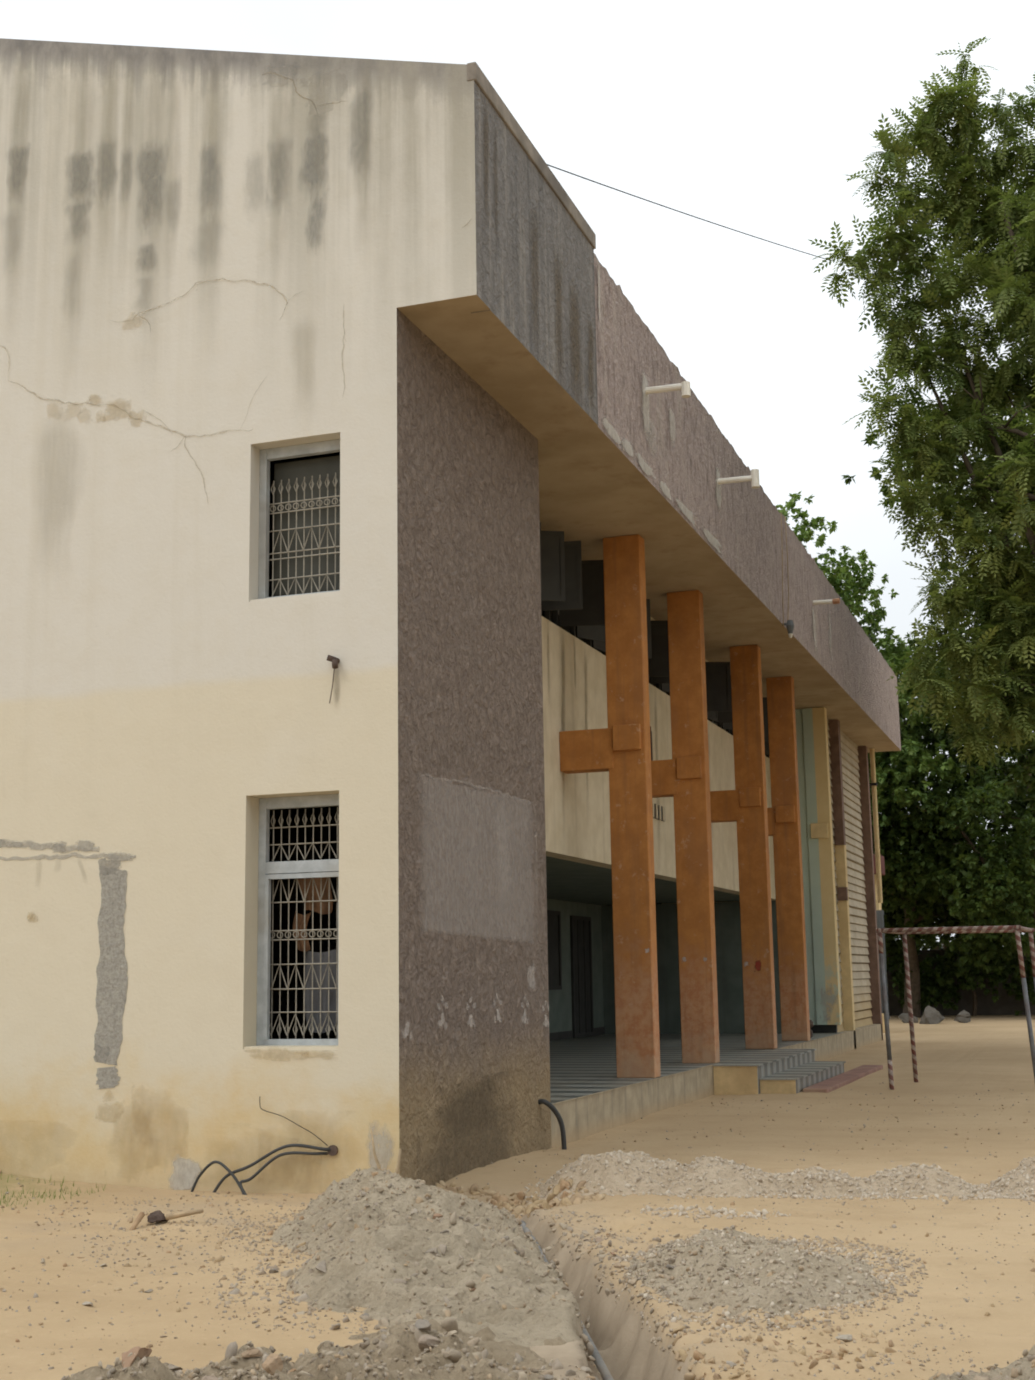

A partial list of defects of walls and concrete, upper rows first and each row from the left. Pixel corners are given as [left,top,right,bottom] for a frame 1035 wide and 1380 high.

flaking render [0,839,136,875]
peeling [94,1044,121,1089]